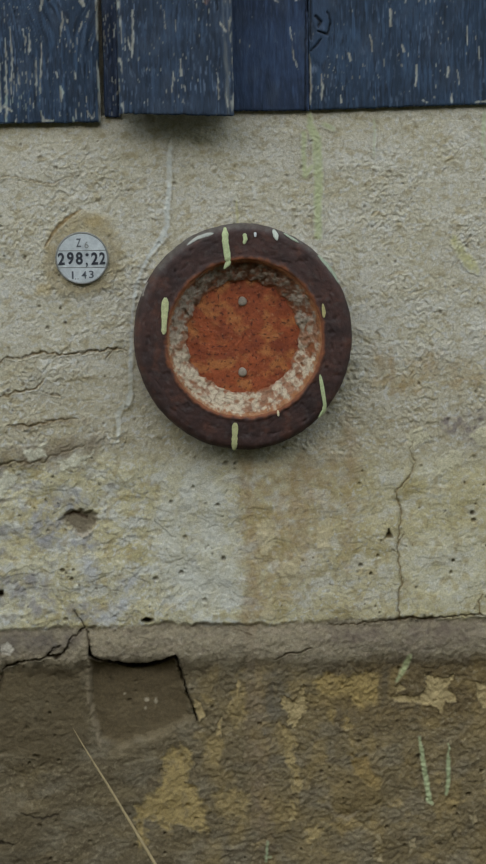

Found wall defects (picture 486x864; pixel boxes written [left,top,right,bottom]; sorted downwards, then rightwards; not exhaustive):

crack [0,346,128,366]
crack [0,378,78,429]
crack [0,445,86,469]
crack [328,440,486,628]
crack [0,609,199,722]
peeling [391,673,458,713]
peeling [474,681,486,709]
spalling [84,634,254,853]
peeling [277,669,384,845]